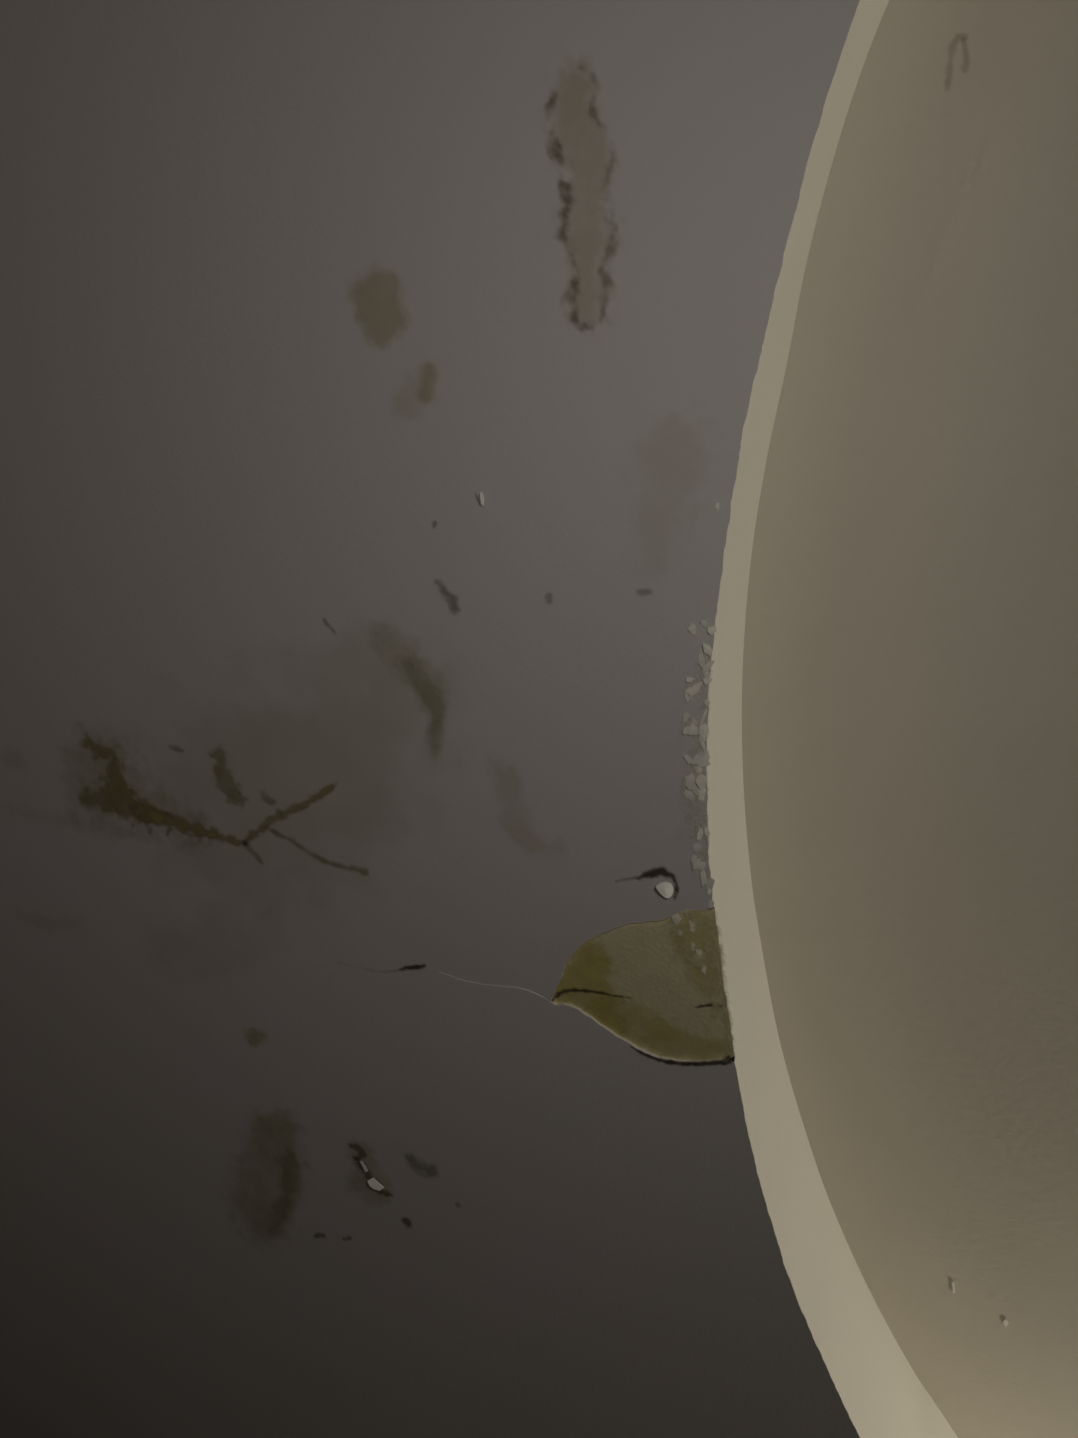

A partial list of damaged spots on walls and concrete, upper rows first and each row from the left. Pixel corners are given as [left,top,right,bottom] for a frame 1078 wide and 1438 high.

spalling [551,620,735,1066]
crack [400,965,551,1003]
peeling [350,1144,392,1196]